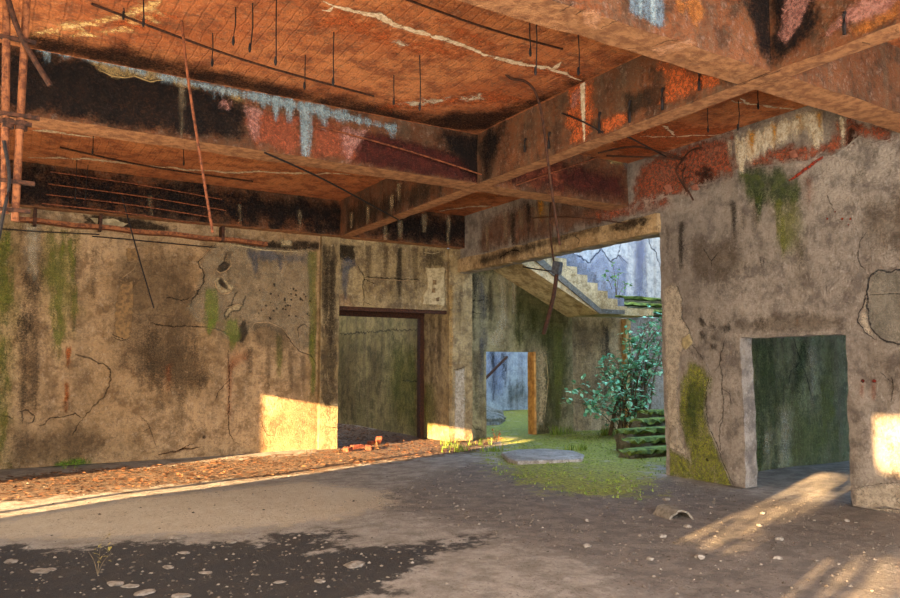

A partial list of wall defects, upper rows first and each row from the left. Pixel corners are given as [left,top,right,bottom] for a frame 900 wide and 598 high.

crack [322,1,582,81]
damp [47,157,139,166]
damp [150,74,477,231]
spalling [751,117,895,168]
spalling [190,236,319,319]
spalling [238,283,317,366]
crack [5,354,113,433]